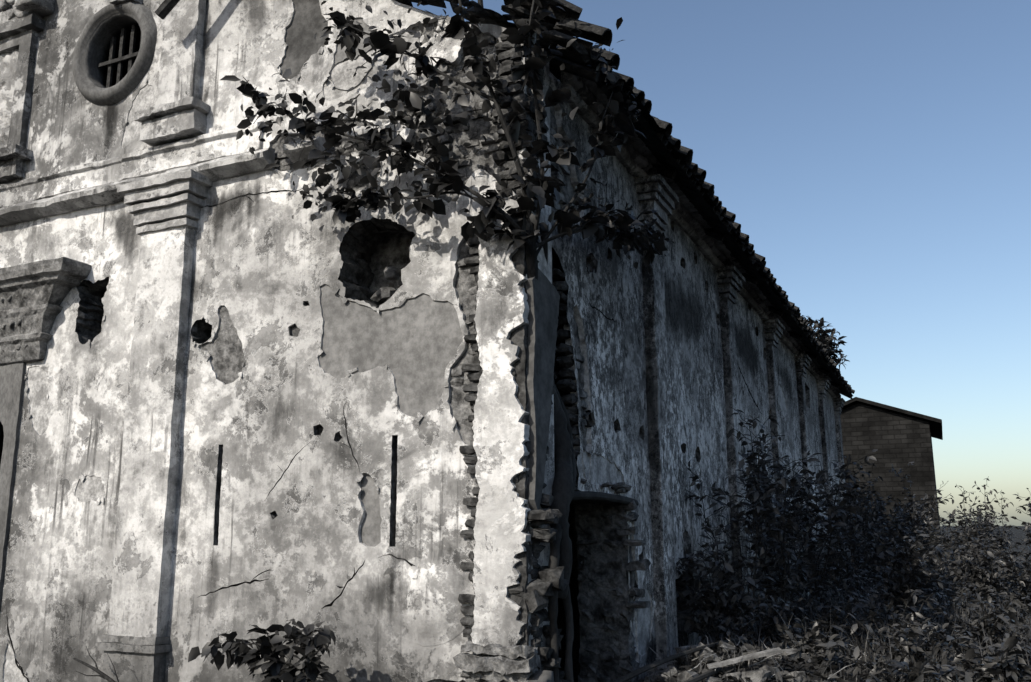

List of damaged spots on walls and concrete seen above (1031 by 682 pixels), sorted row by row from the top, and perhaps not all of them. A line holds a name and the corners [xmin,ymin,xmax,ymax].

spalling [277,0,444,101]
flaking render [269,109,384,191]
flaking render [389,31,503,203]
spalling [75,277,109,348]
flaking render [191,305,244,385]
spalling [303,217,480,445]
water stain [664,279,704,336]
water stain [712,308,808,475]
spalling [353,473,382,547]
crack [197,570,274,598]
crack [322,554,415,609]
crack [6,608,30,682]